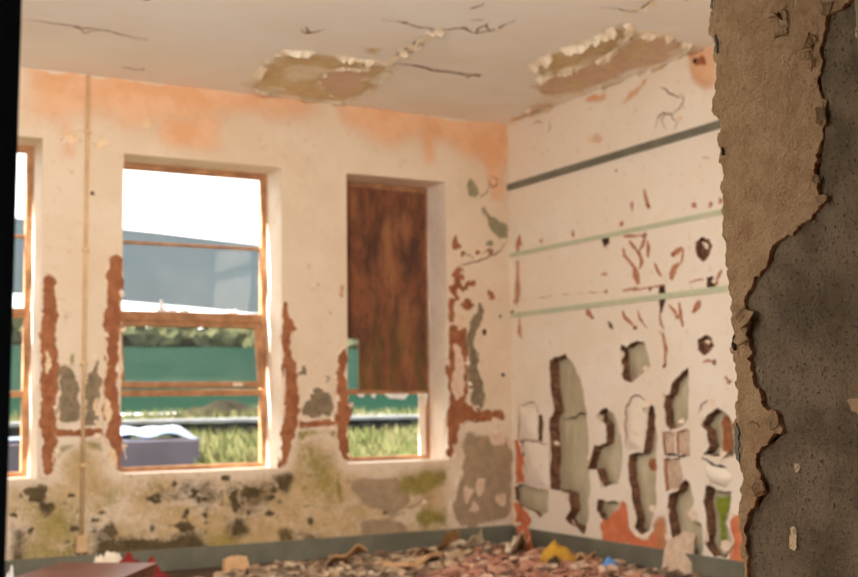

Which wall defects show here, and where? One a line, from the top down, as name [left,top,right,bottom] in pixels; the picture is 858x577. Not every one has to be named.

crack [24,19,146,40]
peeling [240,50,393,106]
crack [379,3,516,78]
crack [655,88,684,128]
flaking render [442,1,858,577]
water stain [6,428,452,560]